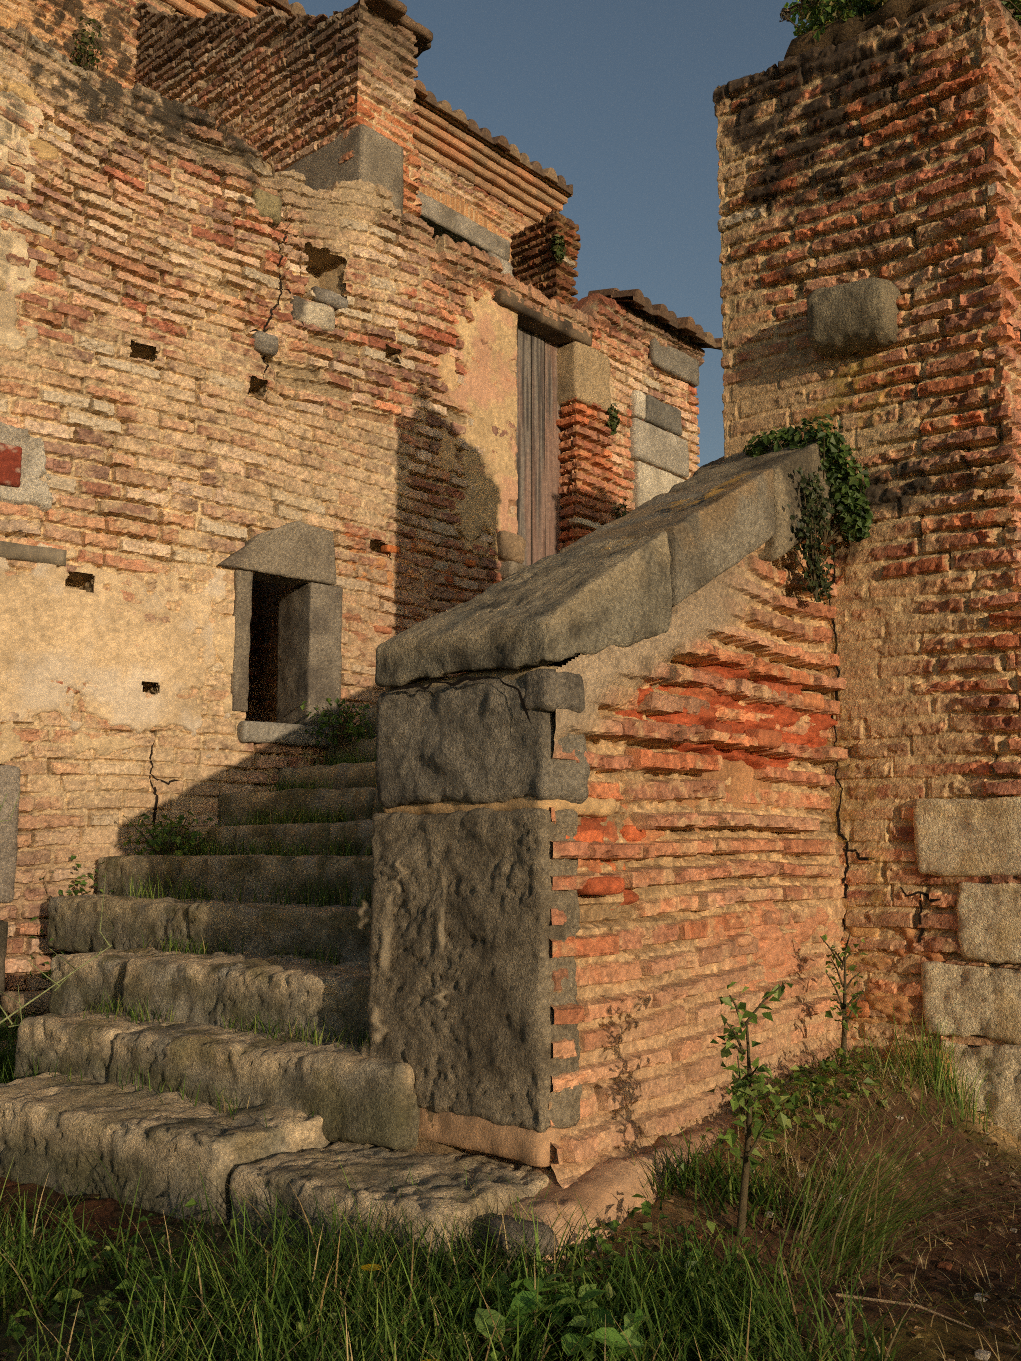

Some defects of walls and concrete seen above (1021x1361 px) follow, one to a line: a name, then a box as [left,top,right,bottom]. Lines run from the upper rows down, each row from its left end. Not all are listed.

flaking render [0,77,65,352]
flaking render [342,278,518,667]
flaking render [0,543,241,765]
crack [149,740,179,833]
crack [829,551,875,941]
crack [900,887,940,943]